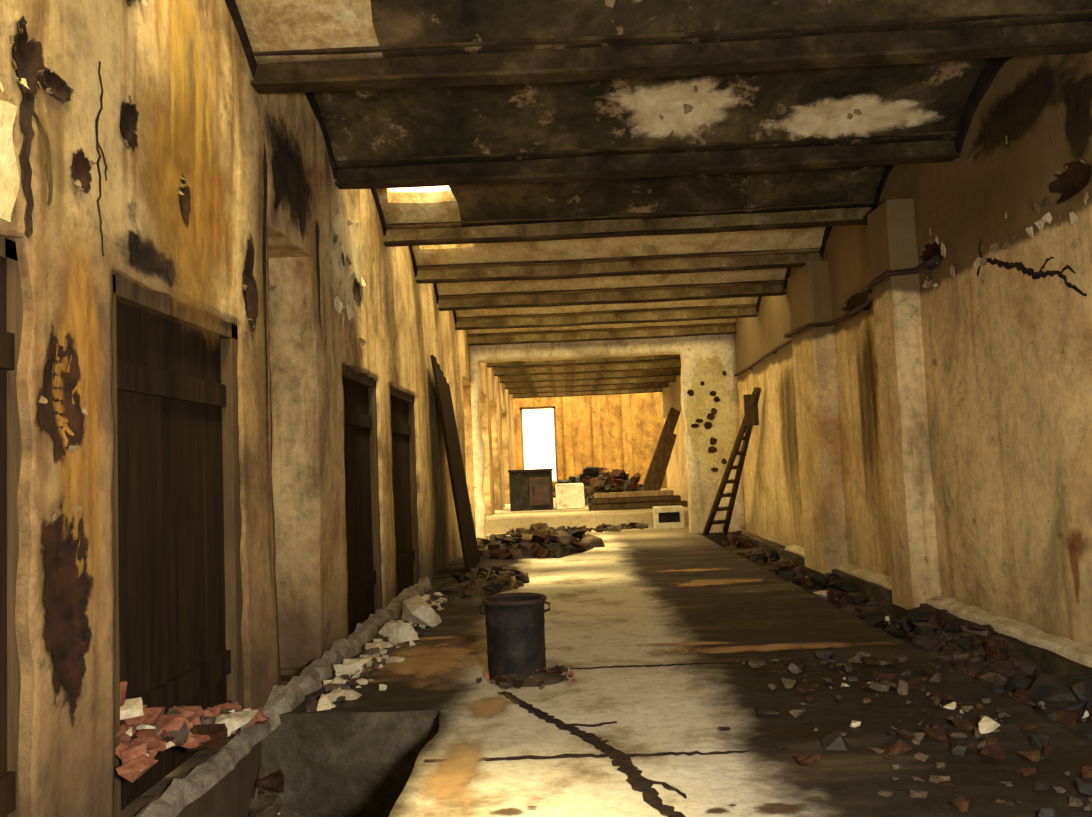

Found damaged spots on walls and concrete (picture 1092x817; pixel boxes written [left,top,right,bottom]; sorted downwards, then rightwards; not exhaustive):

peeling [0,82,19,223]
spalling [10,21,74,103]
crack [95,61,108,256]
peeling [609,78,750,145]
peeling [755,95,936,141]
crack [976,238,1087,296]
spalling [36,325,89,463]
peeling [687,356,736,484]
spalling [41,499,93,726]
rust [1067,532,1084,599]
crack [423,756,444,764]
crack [479,691,777,817]